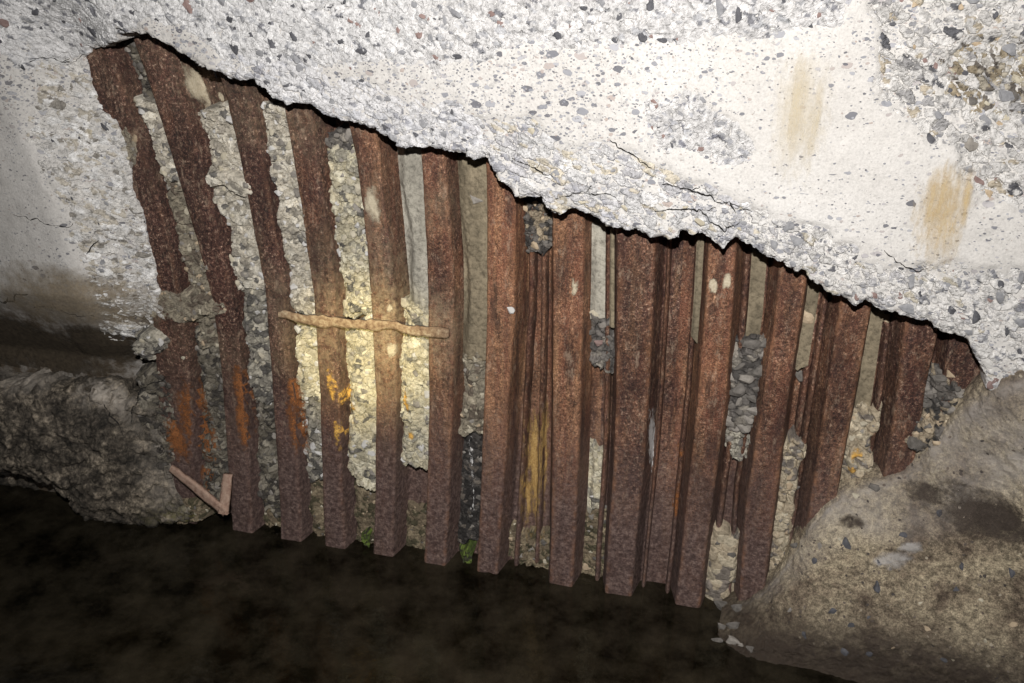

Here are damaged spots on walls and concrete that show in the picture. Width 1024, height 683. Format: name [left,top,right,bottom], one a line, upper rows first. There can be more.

spalling [0,0,1024,389]
crack [610,140,752,232]
rust [166,385,217,486]
rust [233,366,255,446]
rust [286,379,310,452]
rust [327,375,354,410]
rust [521,412,548,531]